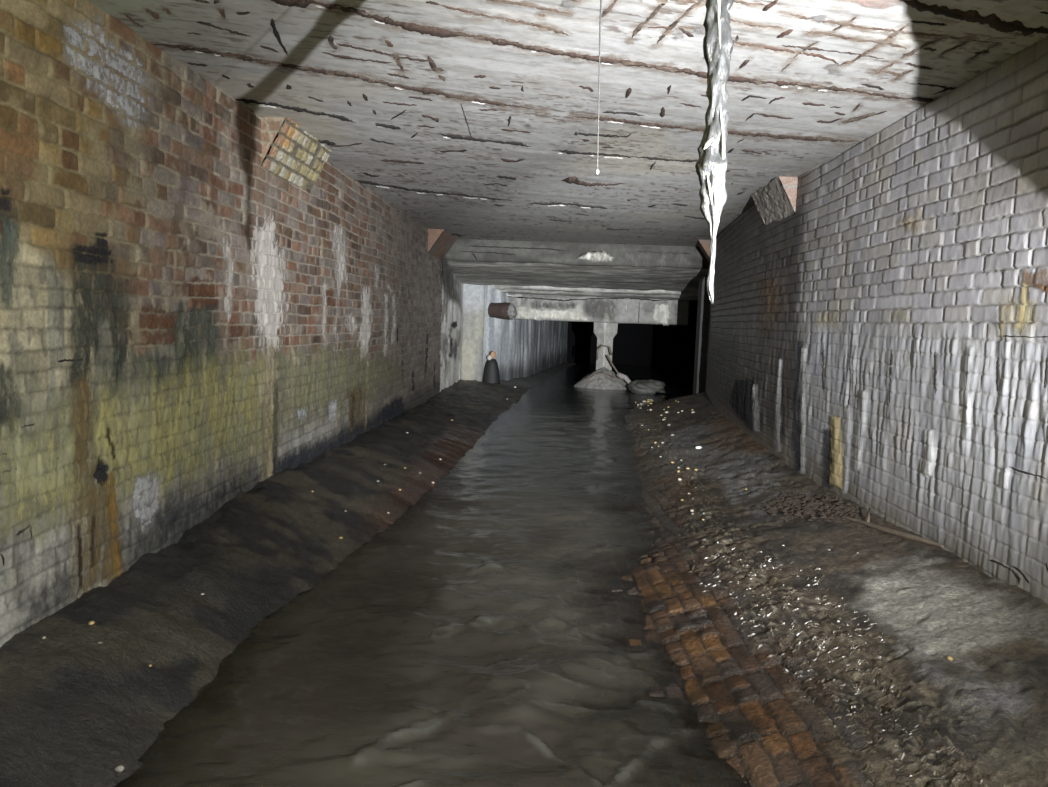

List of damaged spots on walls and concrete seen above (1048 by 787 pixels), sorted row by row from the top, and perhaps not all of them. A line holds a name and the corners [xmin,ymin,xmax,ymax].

efflorescence [64,19,150,127]
crack [150,0,996,261]
efflorescence [221,237,234,321]
corrosion [70,379,123,594]
hole [93,428,115,483]
damp [131,471,246,559]
damp [249,214,435,481]
damp [776,342,808,474]
damp [823,391,868,493]
damp [924,430,935,477]
damp [965,347,974,427]
crack [989,560,1048,584]